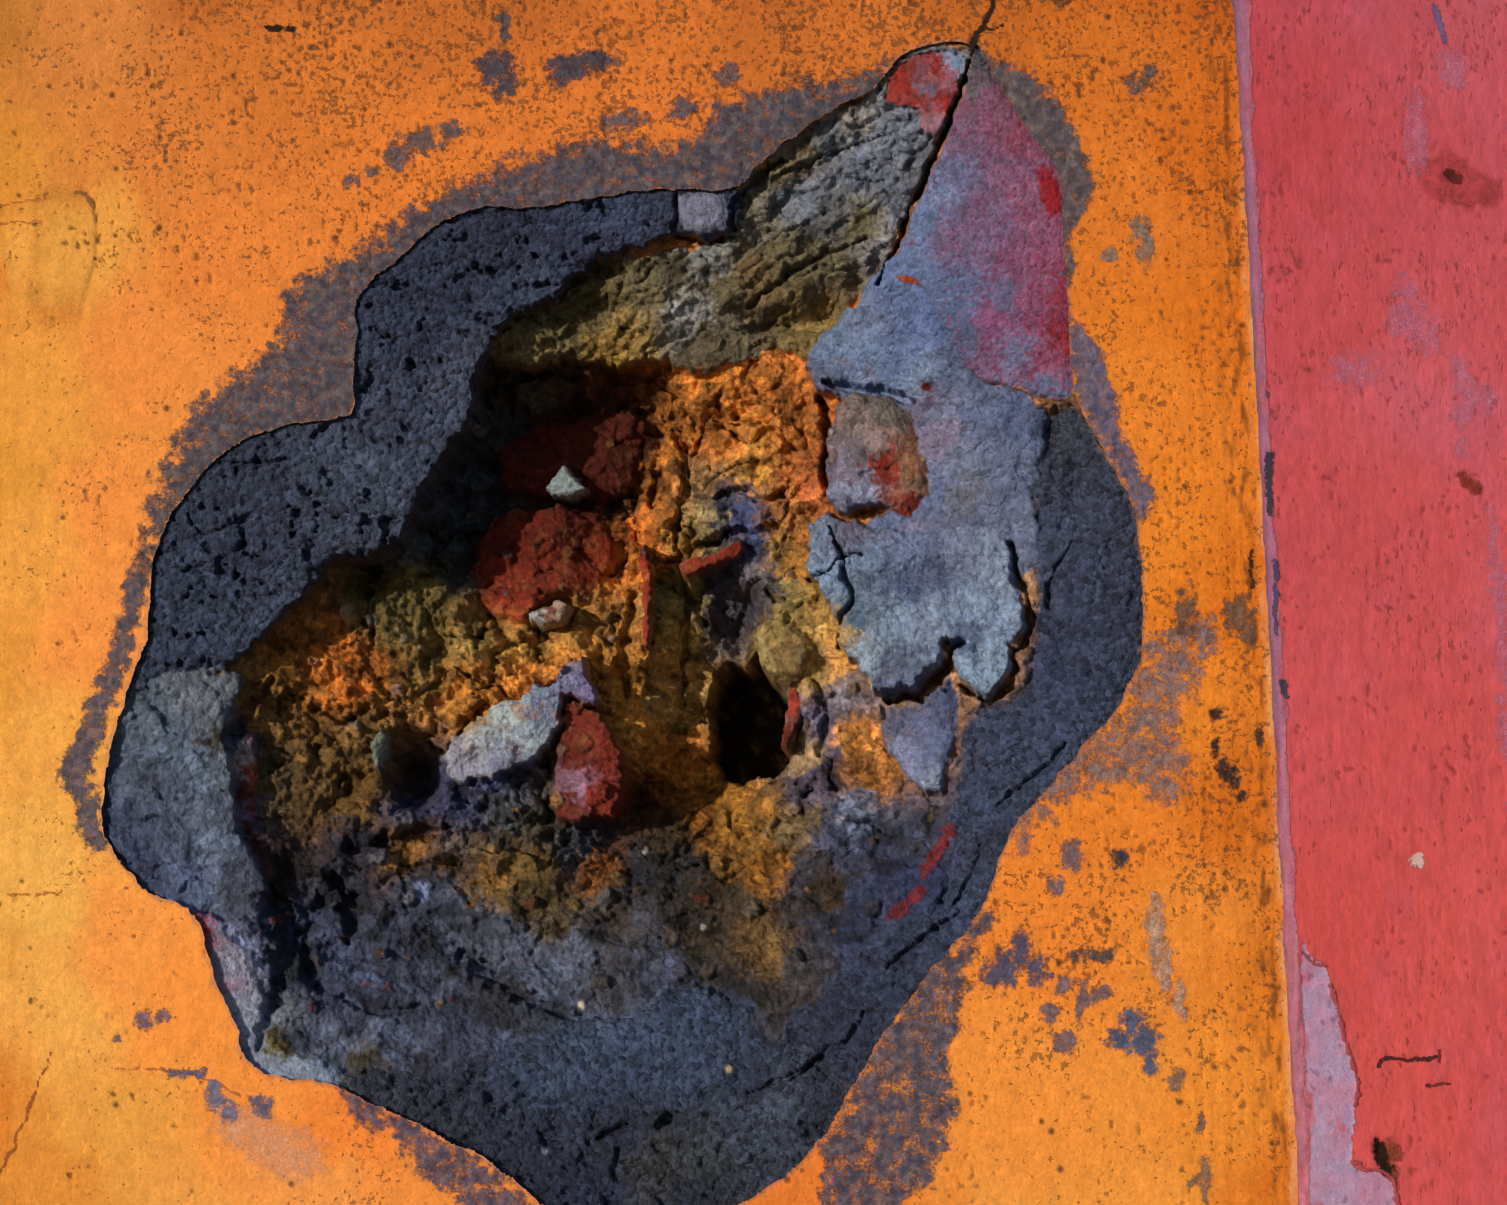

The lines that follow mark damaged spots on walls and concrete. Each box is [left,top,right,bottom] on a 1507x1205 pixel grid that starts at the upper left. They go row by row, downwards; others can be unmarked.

crack [968,0,1004,52]
peeling [471,12,518,101]
peeling [1121,64,1158,101]
peeling [1101,216,1154,271]
spalling [101,41,1143,1205]
peeling [1174,578,1199,633]
peeling [1222,0,1400,1205]
peeling [1103,1008,1186,1091]
peeling [1196,1112,1206,1132]
peeling [1188,1157,1212,1205]